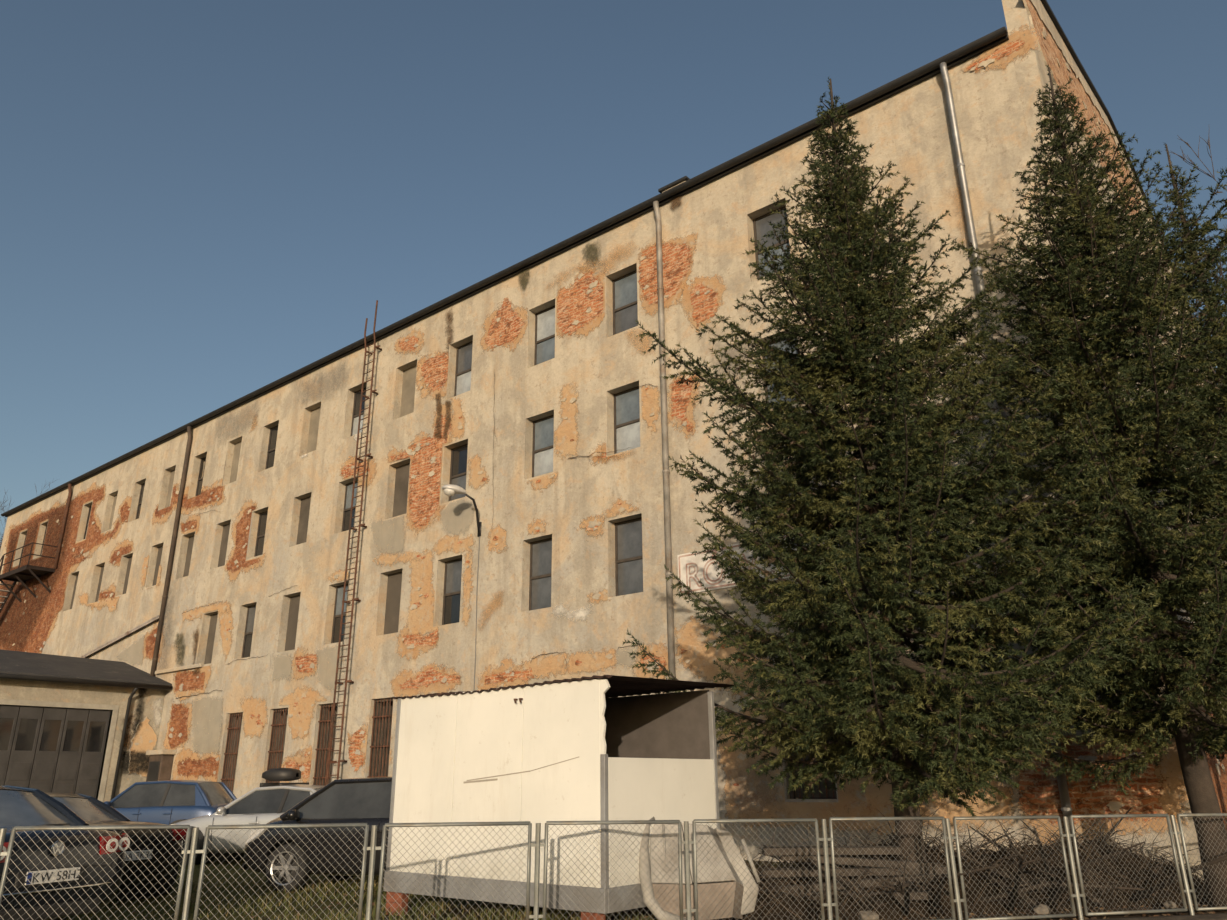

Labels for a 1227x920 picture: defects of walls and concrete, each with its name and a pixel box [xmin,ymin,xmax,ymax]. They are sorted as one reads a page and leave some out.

flaking render [962,0,1142,230]
flaking render [480,298,528,352]
flaking render [556,266,610,339]
flaking render [638,234,726,332]
flaking render [339,328,465,533]
damp [434,394,451,438]
flaking render [641,371,701,439]
flaking render [0,482,162,653]
flaking render [225,499,265,582]
peeling [373,526,508,701]
flaking render [127,665,220,782]
peeling [477,616,896,836]